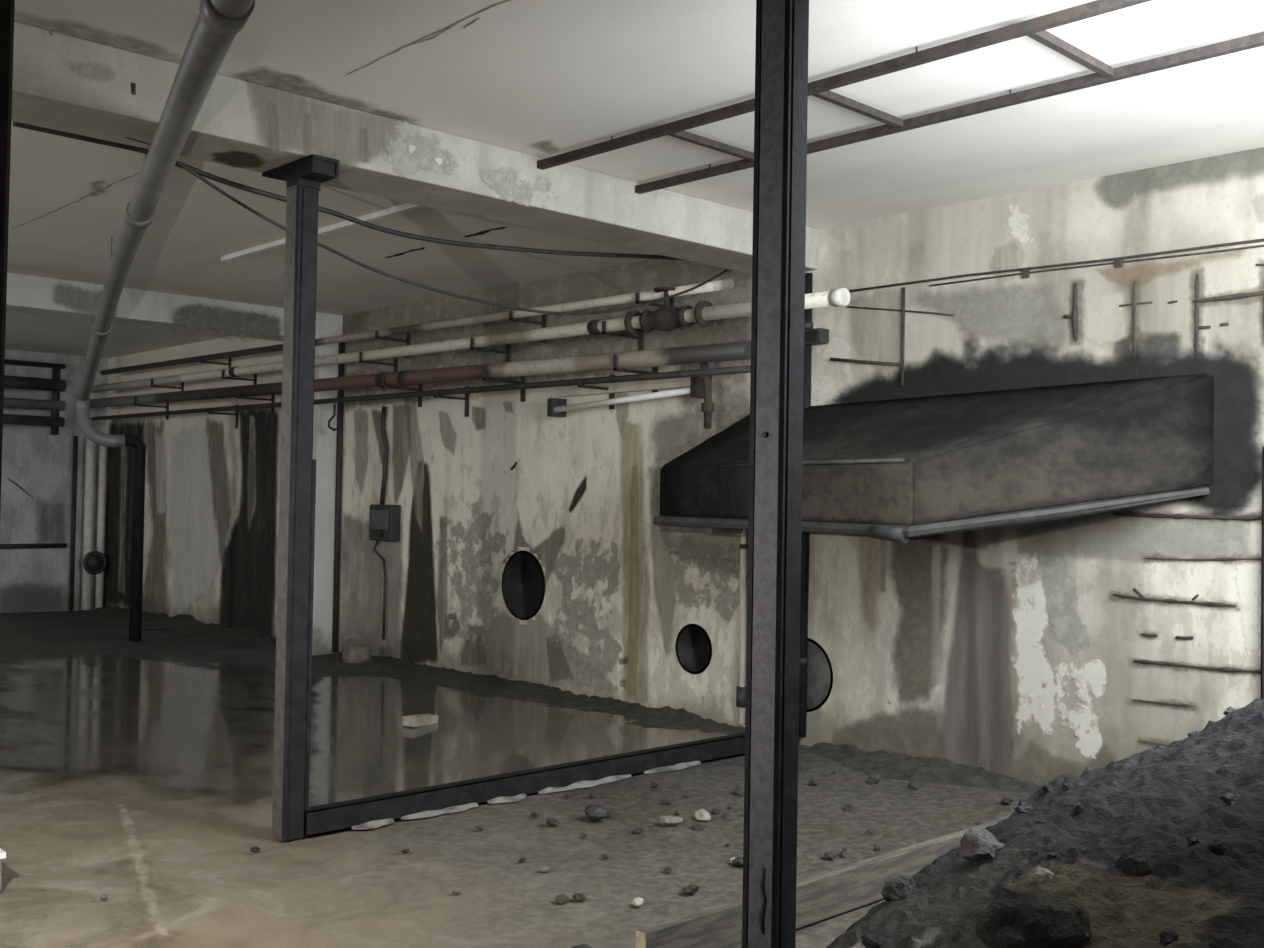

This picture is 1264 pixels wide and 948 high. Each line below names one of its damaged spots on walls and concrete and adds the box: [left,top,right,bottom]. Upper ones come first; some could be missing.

crack [347,0,510,75]
leakage [241,71,406,165]
leakage [1098,147,1264,207]
leakage [206,409,277,636]
peeling [438,501,508,645]
peeling [549,539,628,684]
leakage [833,530,1111,786]
peeling [1012,552,1106,758]